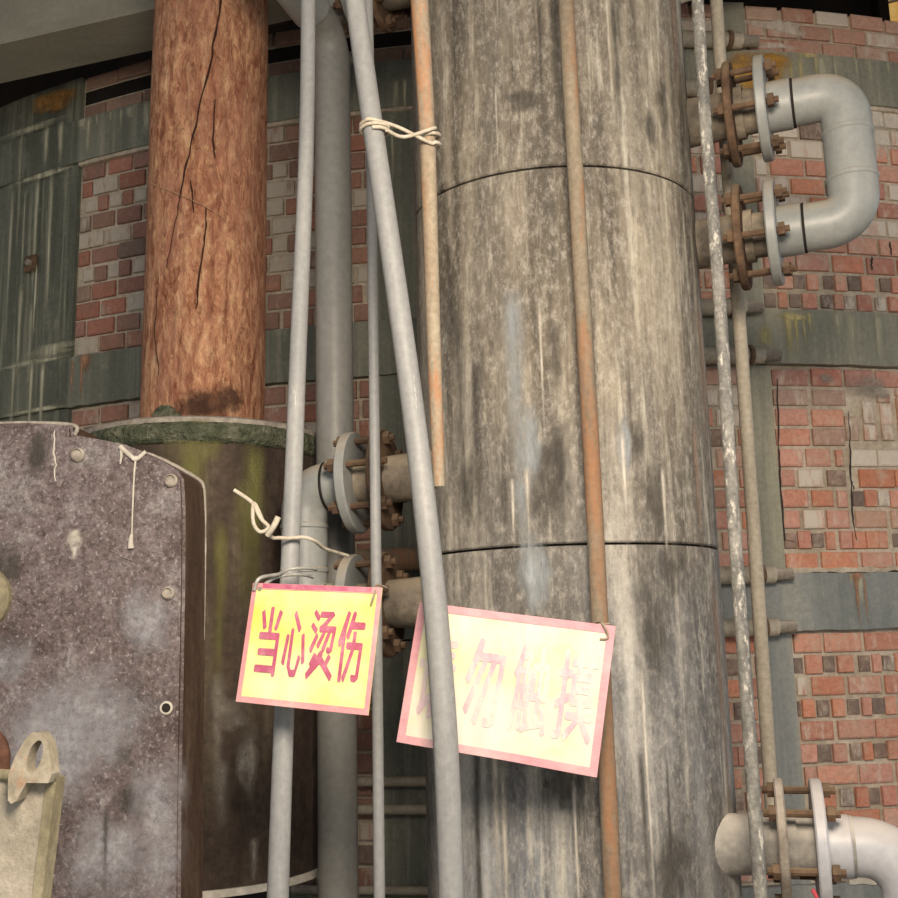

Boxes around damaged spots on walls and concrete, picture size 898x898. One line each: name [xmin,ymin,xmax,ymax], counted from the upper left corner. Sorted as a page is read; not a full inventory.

crack [147,0,226,309]
crack [152,292,160,375]
water stain [181,387,242,415]
crack [848,412,857,540]